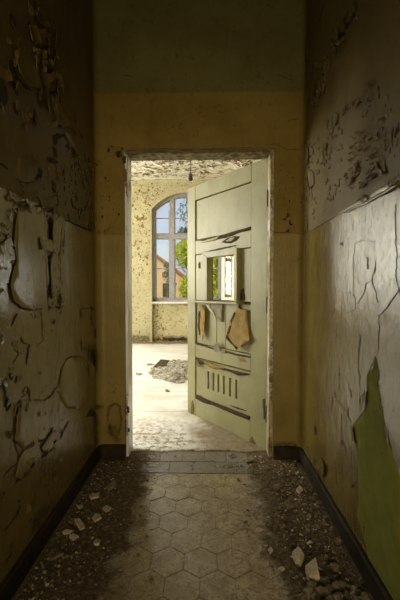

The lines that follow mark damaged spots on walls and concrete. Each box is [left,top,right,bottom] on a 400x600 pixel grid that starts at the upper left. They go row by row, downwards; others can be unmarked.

peeling [300,85,400,233]
peeling [0,190,66,324]
flaking render [104,146,268,341]
crack [344,204,400,349]
peeling [1,389,63,500]
flaking render [68,518,85,530]
peeling [339,357,400,600]